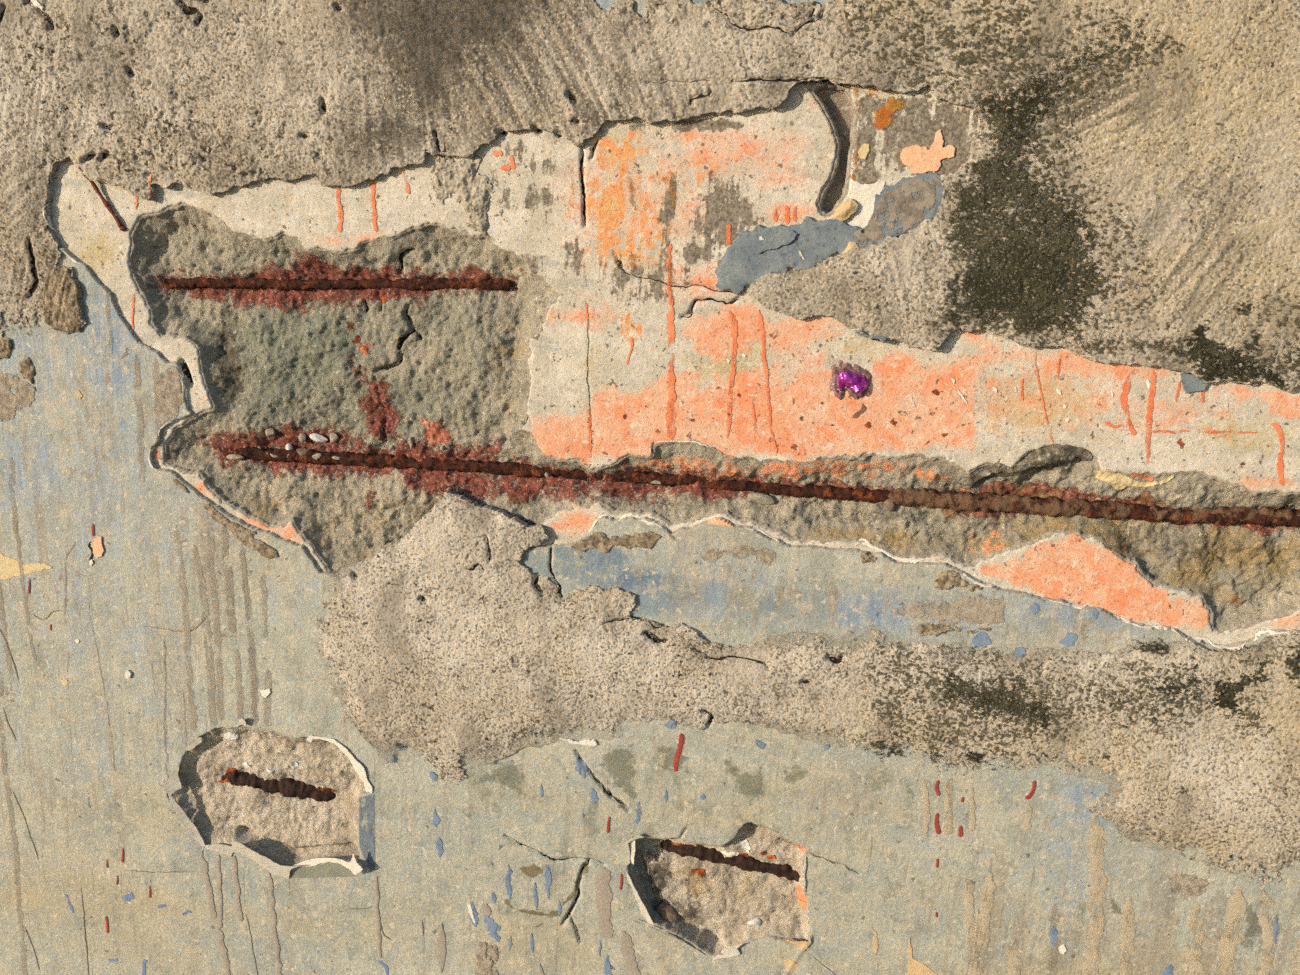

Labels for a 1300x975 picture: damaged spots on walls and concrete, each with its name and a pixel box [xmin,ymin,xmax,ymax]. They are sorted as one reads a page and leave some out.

leakage [830,0,1300,390]
rust [147,249,894,513]
peeling [43,80,1300,650]
rust [916,480,1174,524]
rust [1241,505,1300,539]
crack [606,617,768,668]
spalling [162,718,375,879]
peeling [559,738,598,818]
crack [506,836,603,942]
spalling [613,801,811,960]